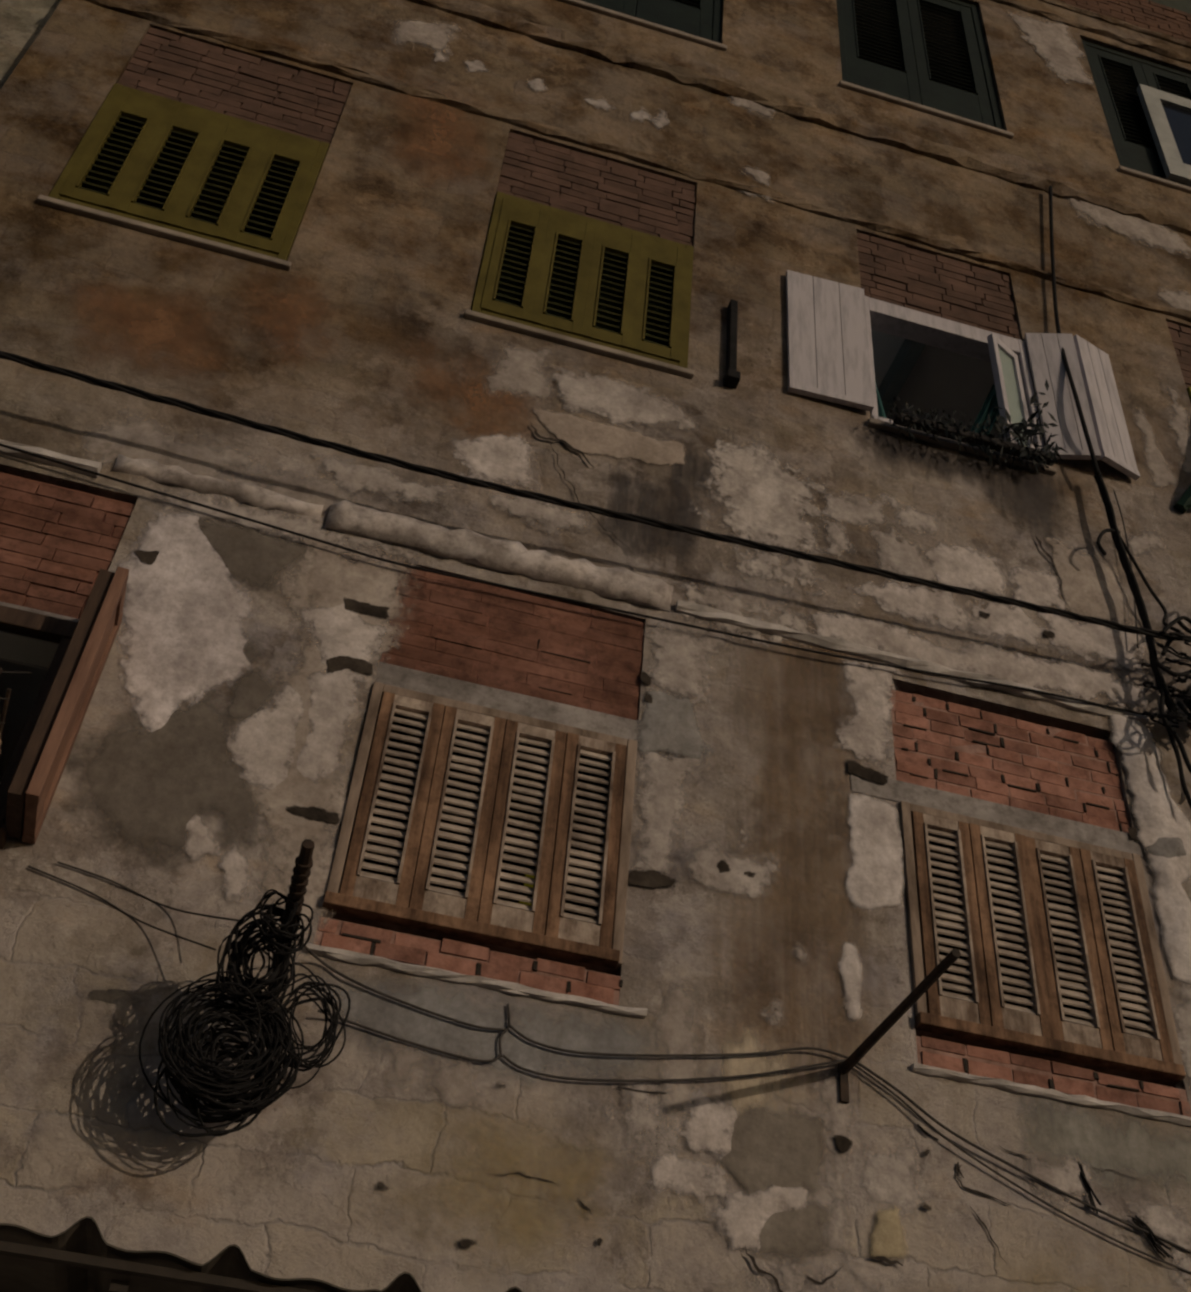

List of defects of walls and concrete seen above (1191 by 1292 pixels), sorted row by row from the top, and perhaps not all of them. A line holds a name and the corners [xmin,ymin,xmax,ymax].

peeling [84,410,251,478]
crack [531,423,635,555]
peeling [486,347,695,465]
crack [1035,535,1071,610]
peeling [118,434,587,956]
peeling [628,430,1147,910]
peeling [839,943,862,1020]
peeling [606,1084,808,1251]
crack [745,1246,903,1292]
peeling [871,1207,907,1258]
crack [955,1162,1011,1261]
crack [1000,1146,1046,1161]